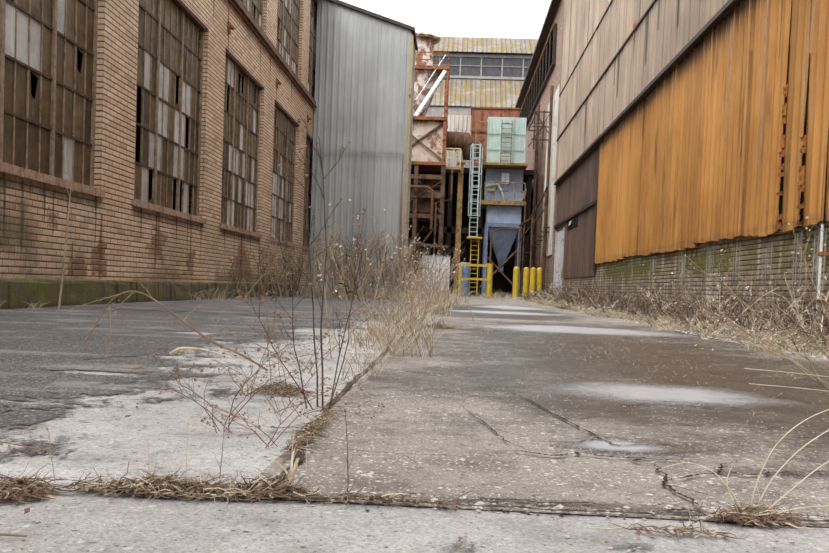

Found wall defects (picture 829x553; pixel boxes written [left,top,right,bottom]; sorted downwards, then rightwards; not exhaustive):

crack [0,477,197,496]
crack [219,312,829,529]